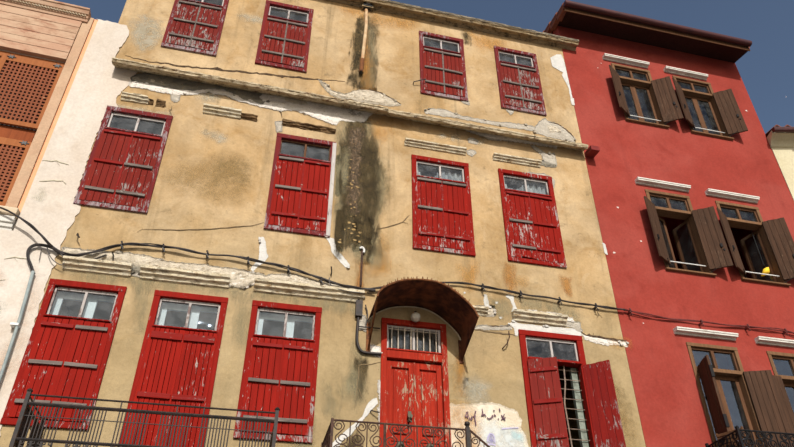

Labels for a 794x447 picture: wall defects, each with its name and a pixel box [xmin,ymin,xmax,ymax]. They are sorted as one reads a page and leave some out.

peeling [129,72,401,125]
water stain [347,17,378,90]
peeling [550,54,575,105]
spalling [424,108,576,188]
water stain [335,121,382,263]
spalling [61,247,352,290]
spalling [475,301,515,325]
spalling [529,309,629,348]
peeling [450,382,529,447]